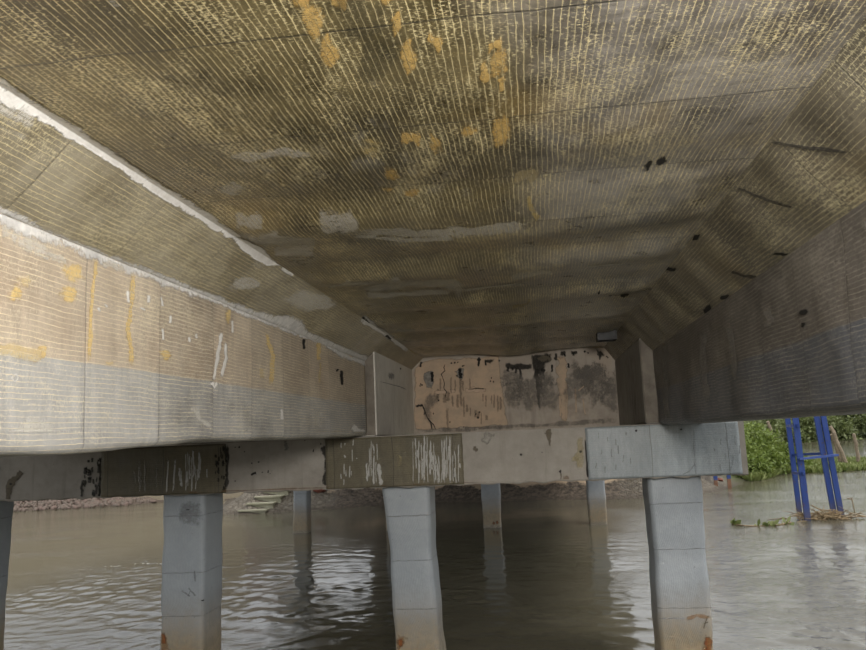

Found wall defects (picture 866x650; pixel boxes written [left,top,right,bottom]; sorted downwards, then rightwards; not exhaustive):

leakage [506,349,609,407]